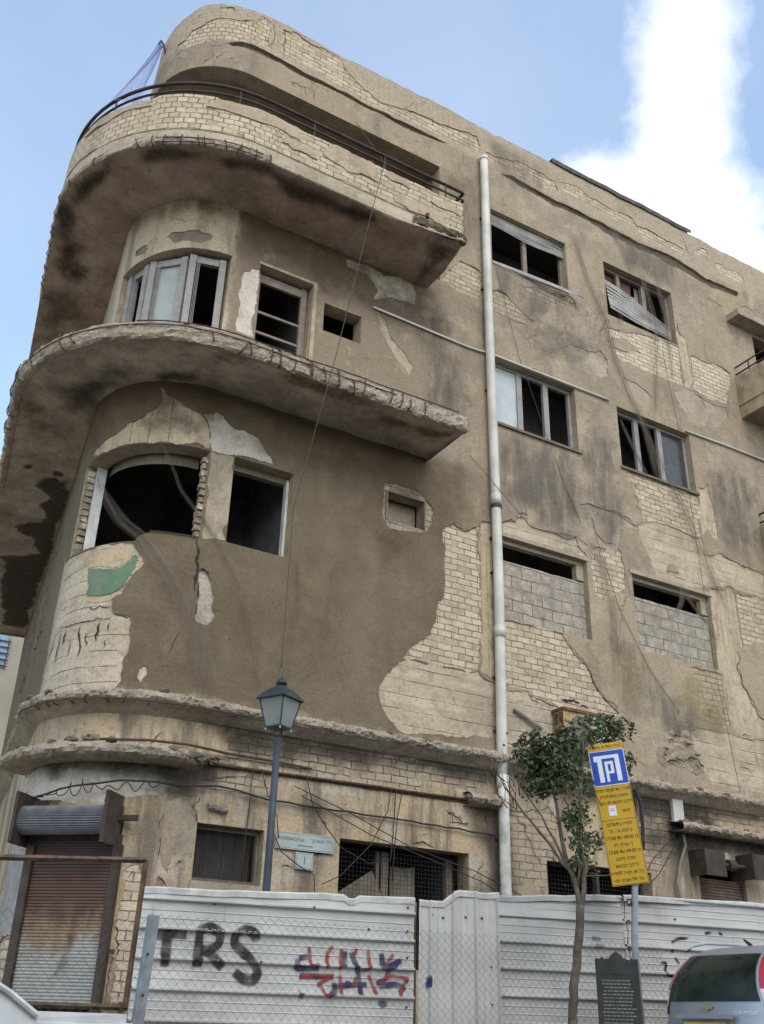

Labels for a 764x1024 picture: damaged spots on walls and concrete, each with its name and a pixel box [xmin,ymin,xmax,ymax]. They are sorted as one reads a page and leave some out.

water stain [58,205,80,277]
water stain [77,171,104,199]
peeling [168,227,212,244]
water stain [223,159,374,221]
peeling [346,258,421,304]
spalling [0,265,470,495]
peeling [564,325,730,428]
peeling [94,385,277,540]
crack [169,539,200,653]
peeling [0,471,628,891]
peeling [627,472,764,879]